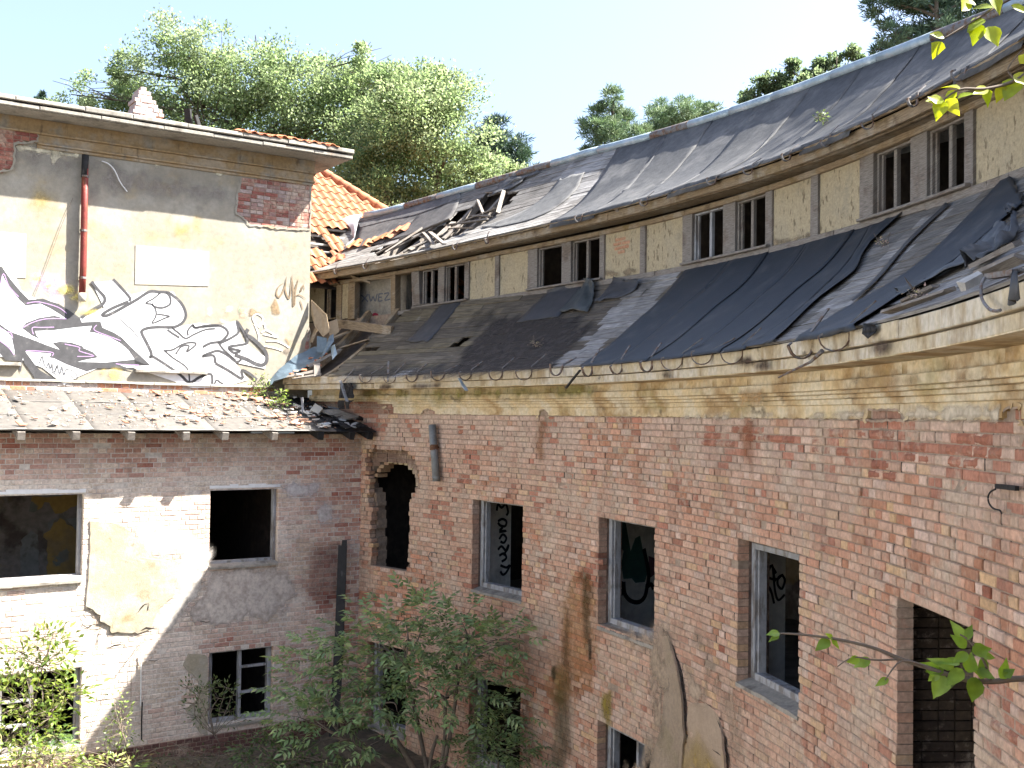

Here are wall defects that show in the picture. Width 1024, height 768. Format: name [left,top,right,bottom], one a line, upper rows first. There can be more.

flaking render [0,129,79,173]
flaking render [235,176,312,231]
spalling [367,444,421,502]
water stain [602,692,611,723]